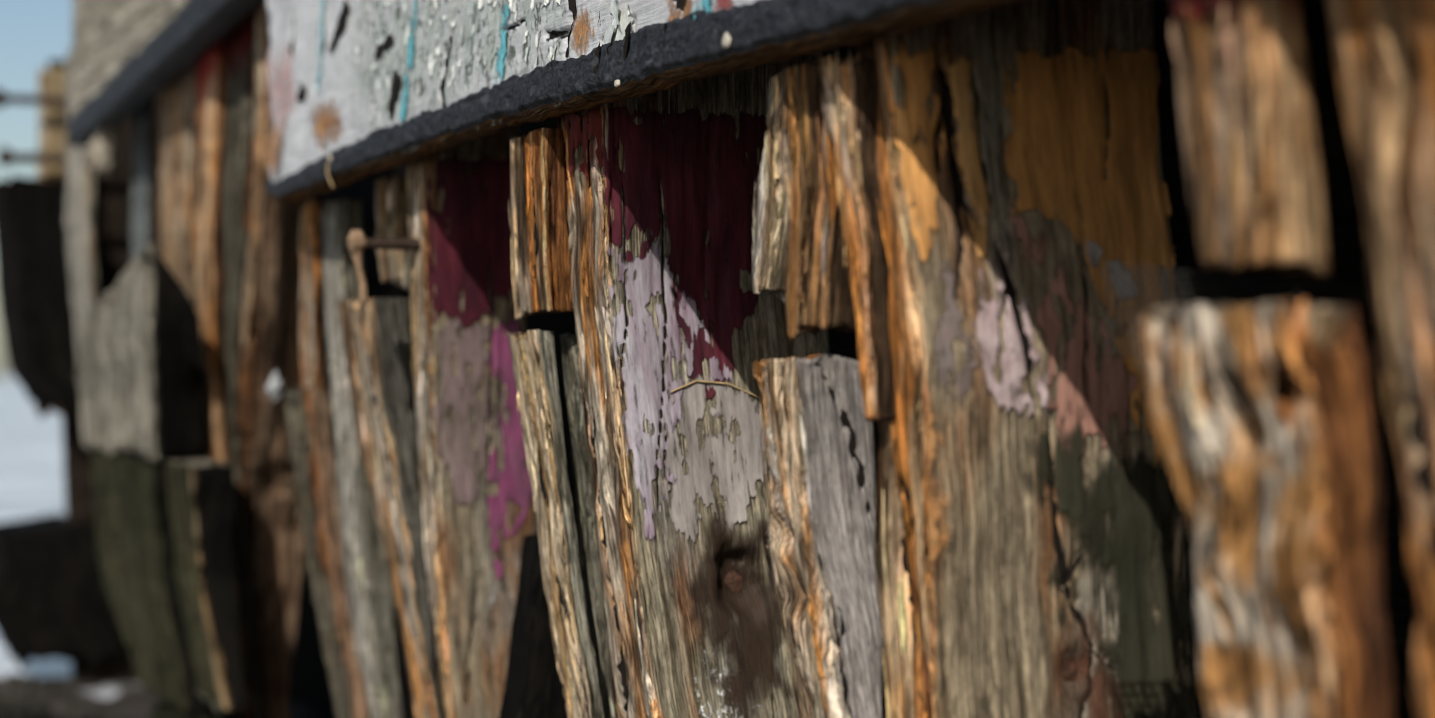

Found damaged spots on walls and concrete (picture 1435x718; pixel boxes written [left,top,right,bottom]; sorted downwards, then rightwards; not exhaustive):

peeling [297,82,305,102]
peeling [329,0,561,127]
peeling [604,0,634,51]
corrosion [351,251,368,302]
peeling [557,106,767,543]
crack [934,48,1116,718]